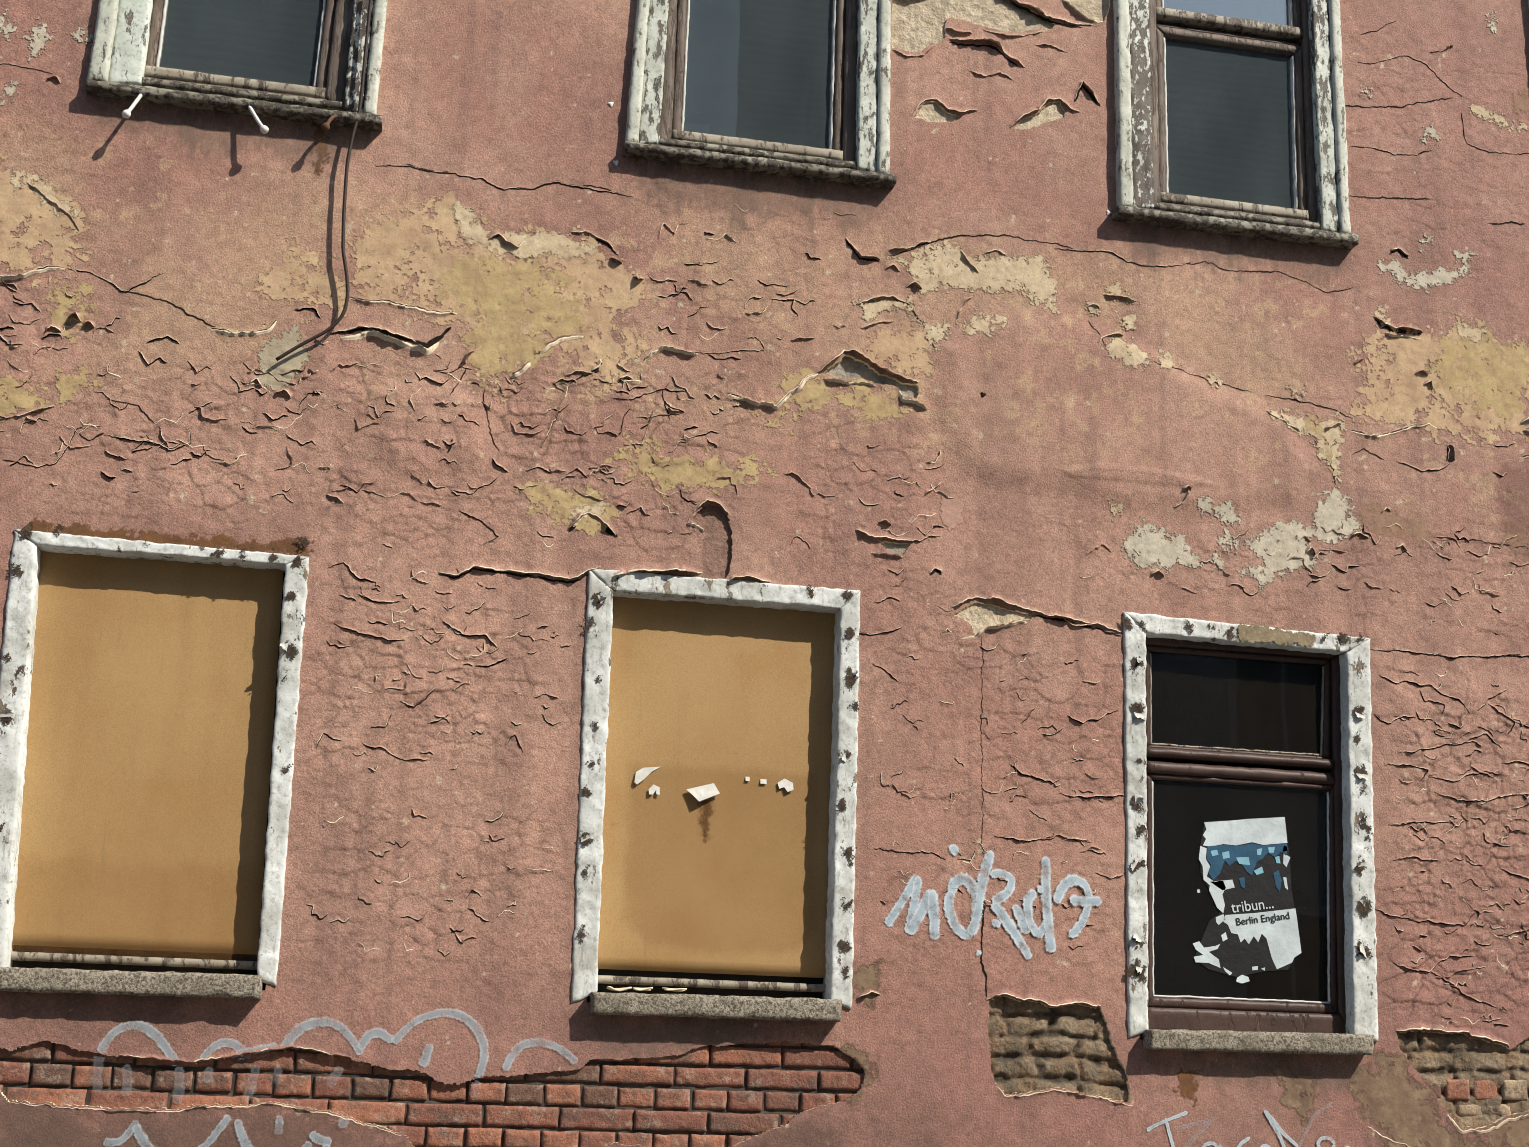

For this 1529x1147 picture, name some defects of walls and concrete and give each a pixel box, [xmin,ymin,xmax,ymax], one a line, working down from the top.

flaking render [891,0,1110,80]
crack [375,163,633,197]
crack [0,262,764,545]
peeling [0,152,1073,701]
peeling [1079,308,1529,628]
crack [328,559,405,641]
crack [980,636,1126,879]
crack [1370,647,1529,861]
flaking render [0,1040,880,1147]
flaking render [944,887,1133,1109]
flaking render [1349,682,1529,1147]
crack [1375,867,1529,1026]